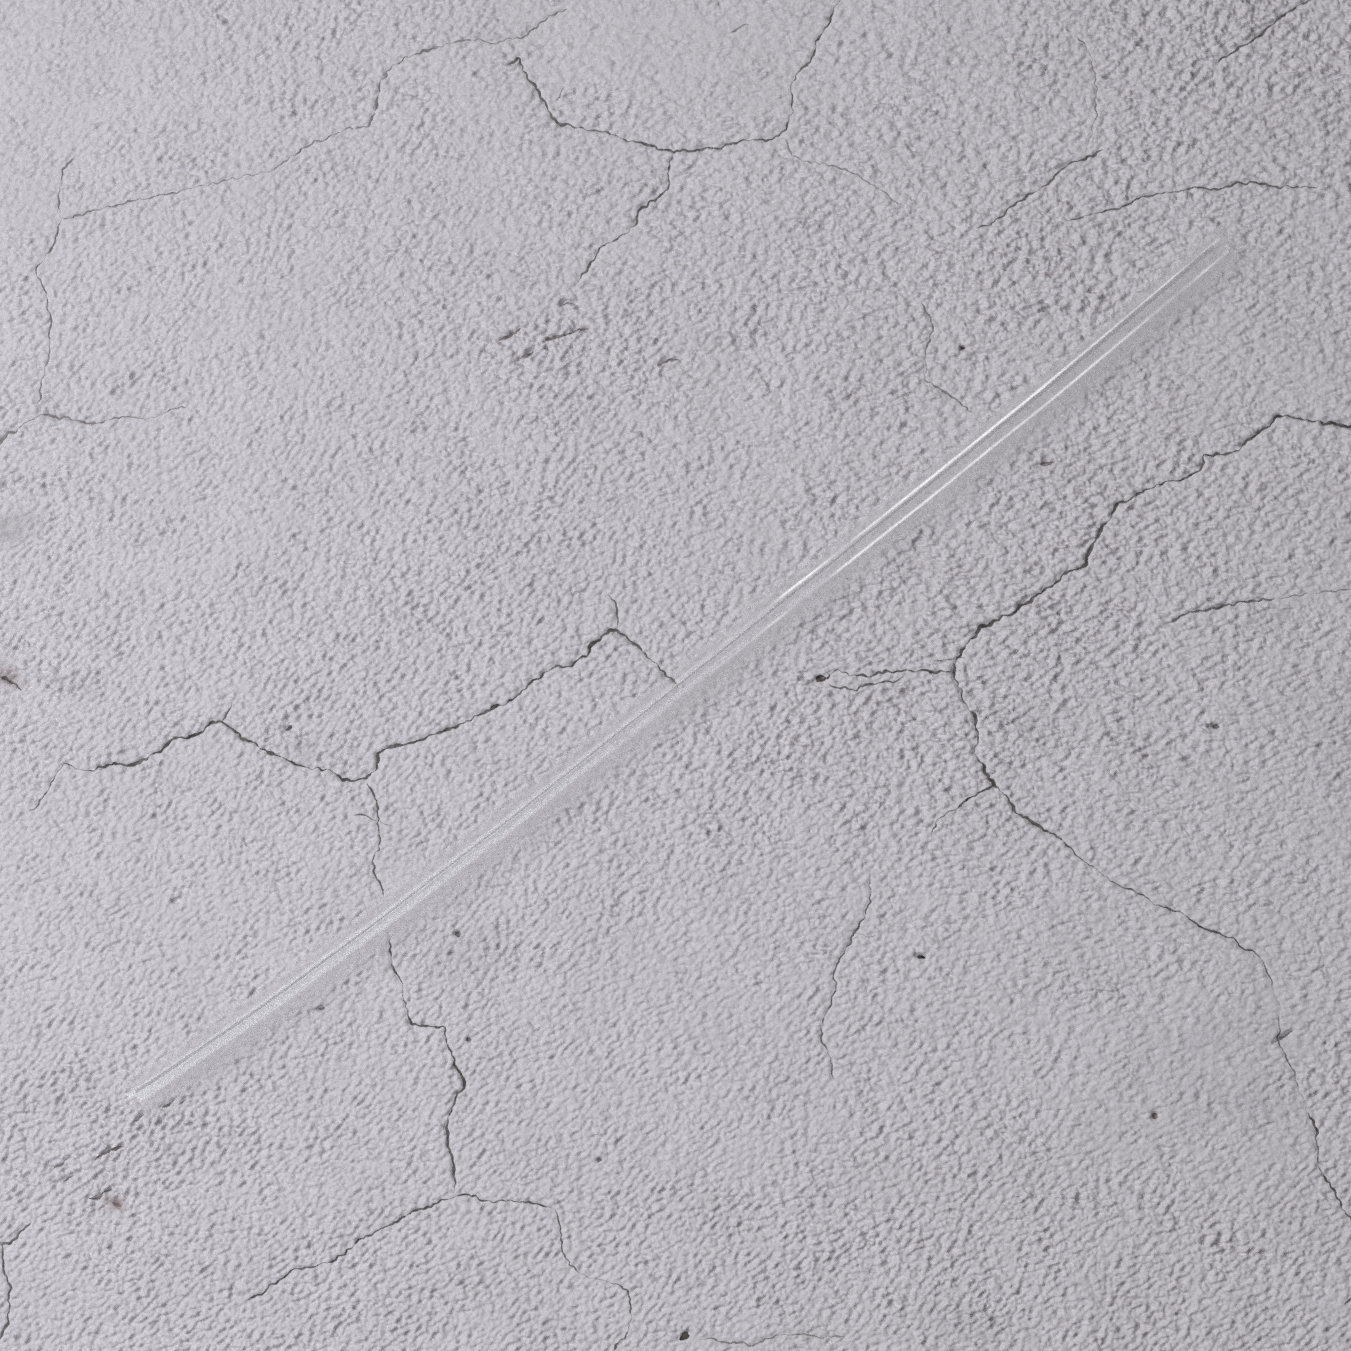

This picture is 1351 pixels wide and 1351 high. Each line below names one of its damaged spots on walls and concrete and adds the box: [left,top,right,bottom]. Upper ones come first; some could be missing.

crack [1217,0,1309,63]
crack [0,0,899,444]
crack [977,37,1103,228]
crack [1068,181,1315,221]
crack [921,303,968,410]
crack [29,595,678,894]
crack [820,414,1351,1220]
crack [248,938,632,1351]
crack [0,1222,31,1338]
crack [699,1333,841,1347]